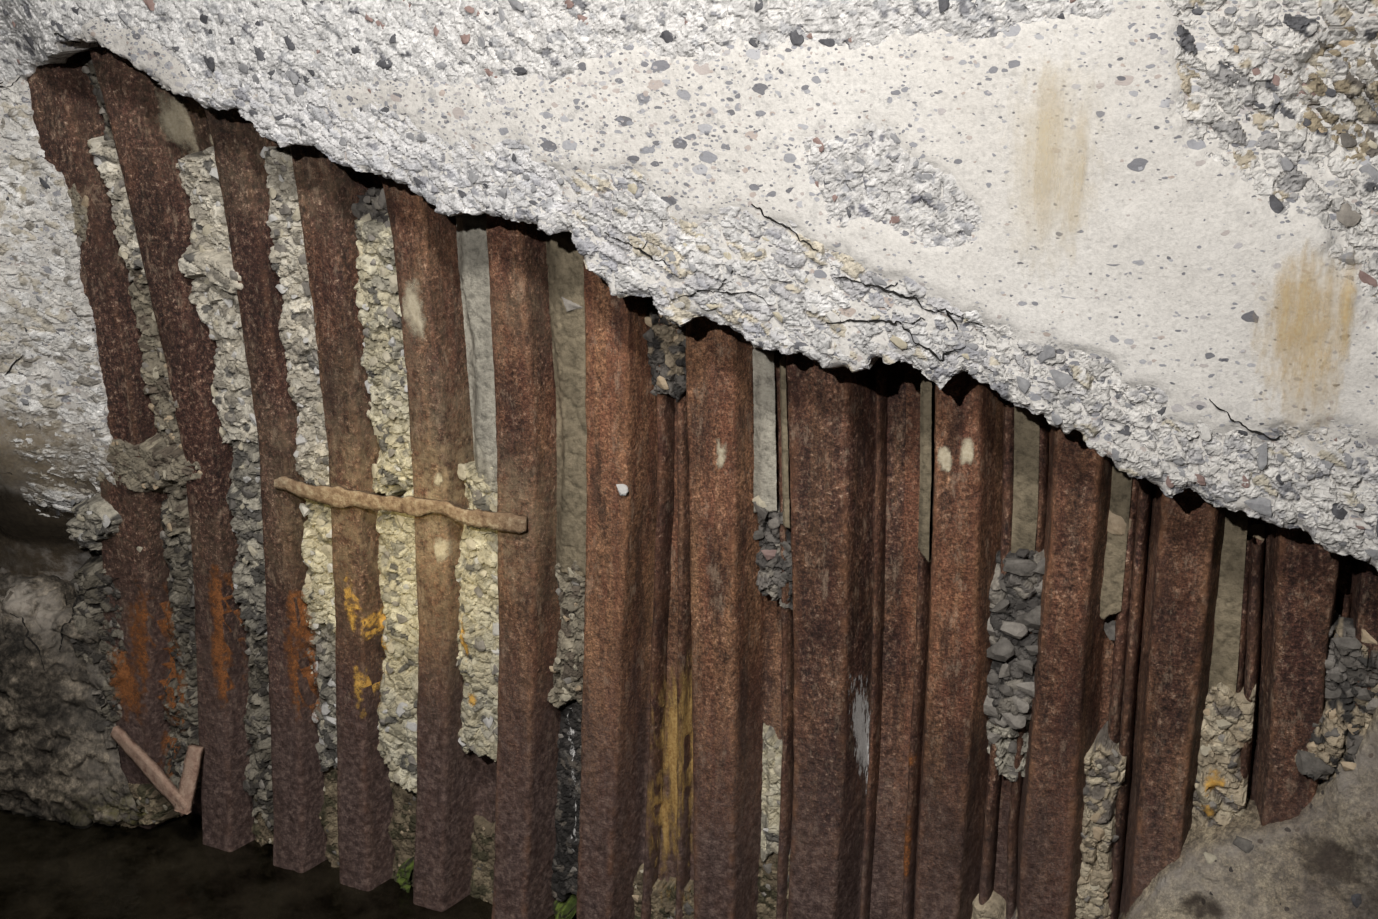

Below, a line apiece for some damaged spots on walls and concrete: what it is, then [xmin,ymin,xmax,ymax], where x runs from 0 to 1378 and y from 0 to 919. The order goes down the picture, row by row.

spalling [0,0,1378,569]
crack [751,204,985,361]
corrosion [108,593,185,776]
corrosion [208,567,244,701]
corrosion [283,592,320,719]
corrosion [344,577,386,649]
corrosion [354,667,382,700]
corrosion [648,672,693,856]